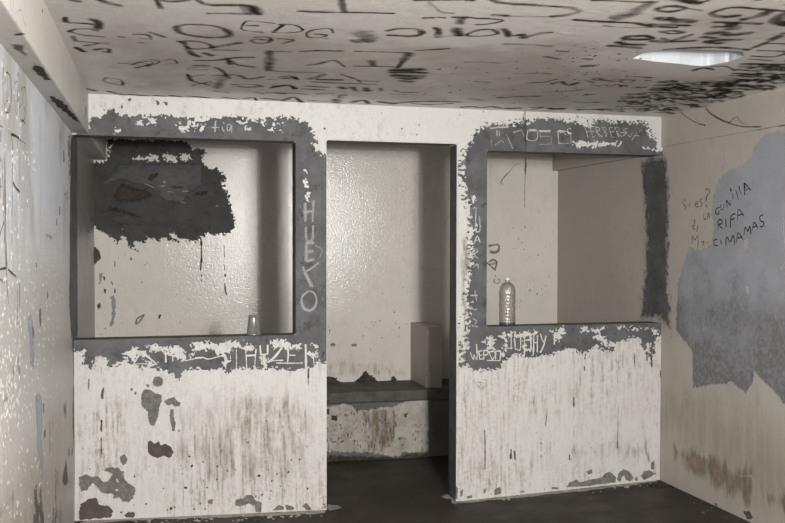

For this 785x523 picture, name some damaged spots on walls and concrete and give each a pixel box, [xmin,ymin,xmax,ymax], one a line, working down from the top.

peeling [74,98,326,431]
peeling [458,116,663,373]
peeling [676,130,785,404]
peeling [33,393,73,523]
spalling [147,441,173,458]
spalling [235,495,262,512]
spalling [273,497,327,511]
water stain [687,452,751,504]